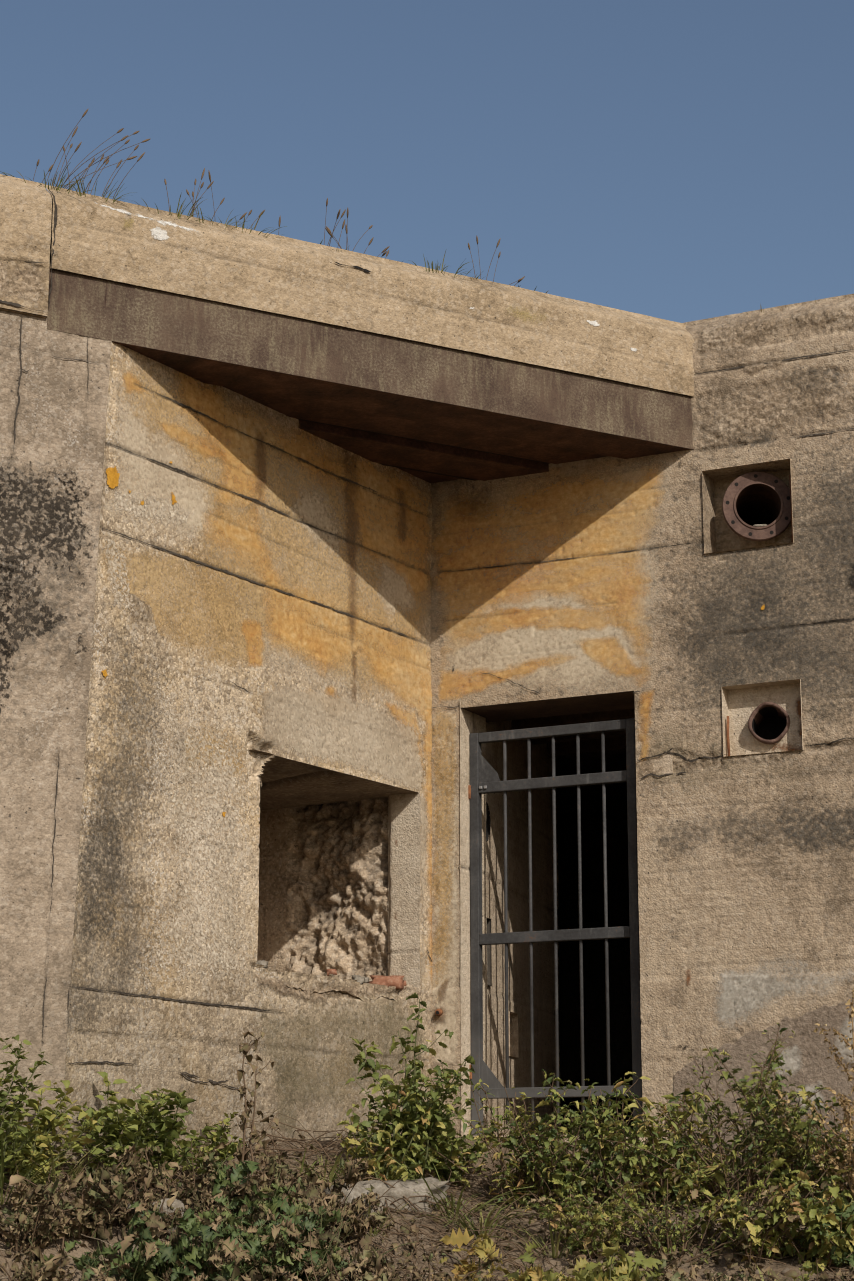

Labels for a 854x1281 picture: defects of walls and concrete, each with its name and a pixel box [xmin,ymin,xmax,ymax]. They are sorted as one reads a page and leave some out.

water stain [686,469,854,718]
water stain [0,365,658,1026]
crack [636,748,727,779]
rust [773,699,802,751]
crack [804,737,854,746]